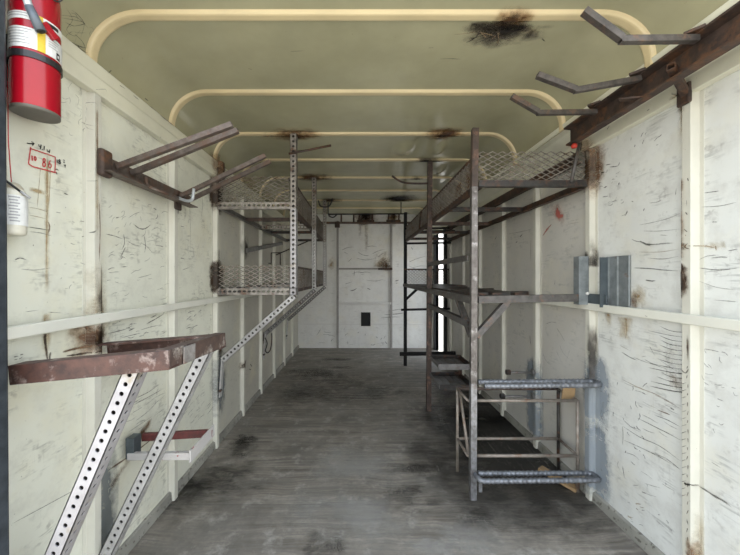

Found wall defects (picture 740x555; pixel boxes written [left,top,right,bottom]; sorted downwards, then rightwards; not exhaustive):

corrosion [276,130,315,139]
corrosion [431,128,459,139]
corrosion [580,141,603,189]
corrosion [210,260,223,293]
corrosion [64,326,104,356]